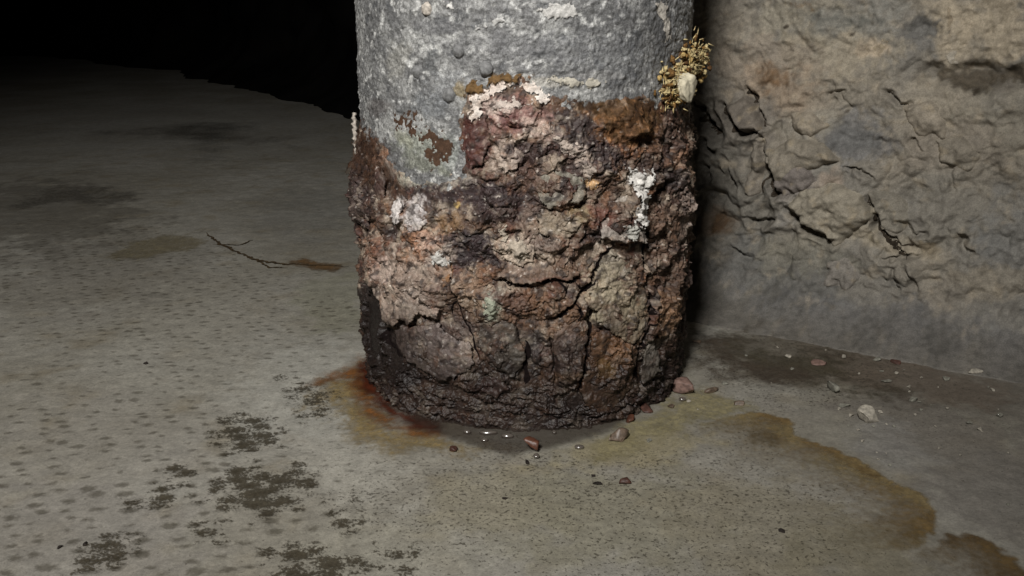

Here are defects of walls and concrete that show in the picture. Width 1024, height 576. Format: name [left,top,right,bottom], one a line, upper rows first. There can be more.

crack [693,88,767,149]
rust [306,73,699,453]
water stain [623,166,657,243]
crack [761,173,782,197]
crack [867,199,914,260]
crack [492,246,614,394]
crack [634,227,662,383]
water stain [274,374,344,424]
water stain [120,411,369,545]
water stain [728,412,1024,576]
water stain [62,531,145,576]
water stain [257,541,419,576]